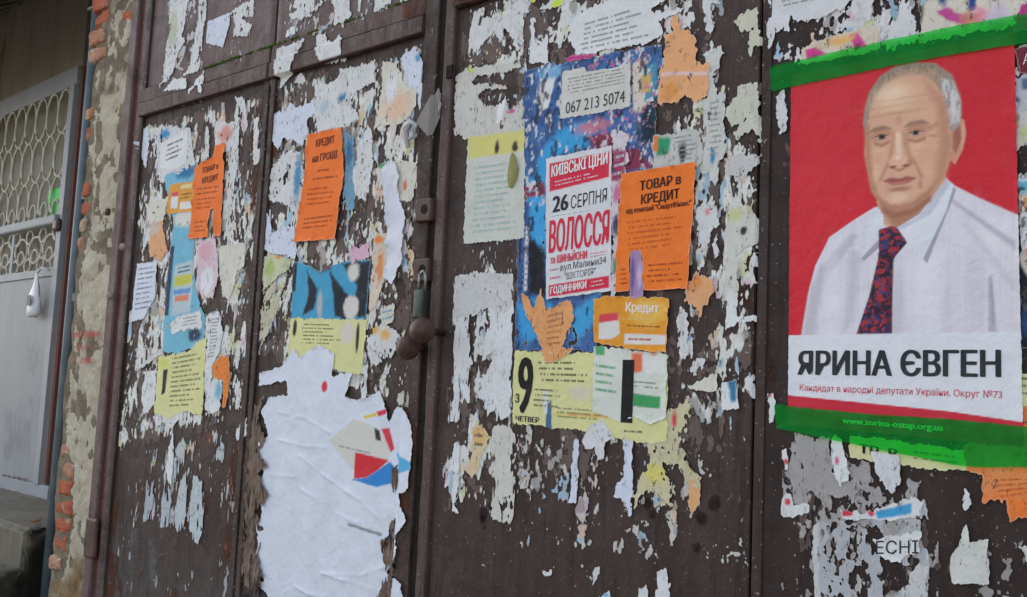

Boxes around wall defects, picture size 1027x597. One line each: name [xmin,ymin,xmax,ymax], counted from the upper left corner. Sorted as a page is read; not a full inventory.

flaking render [88,0,132,65]
flaking render [48,444,74,570]